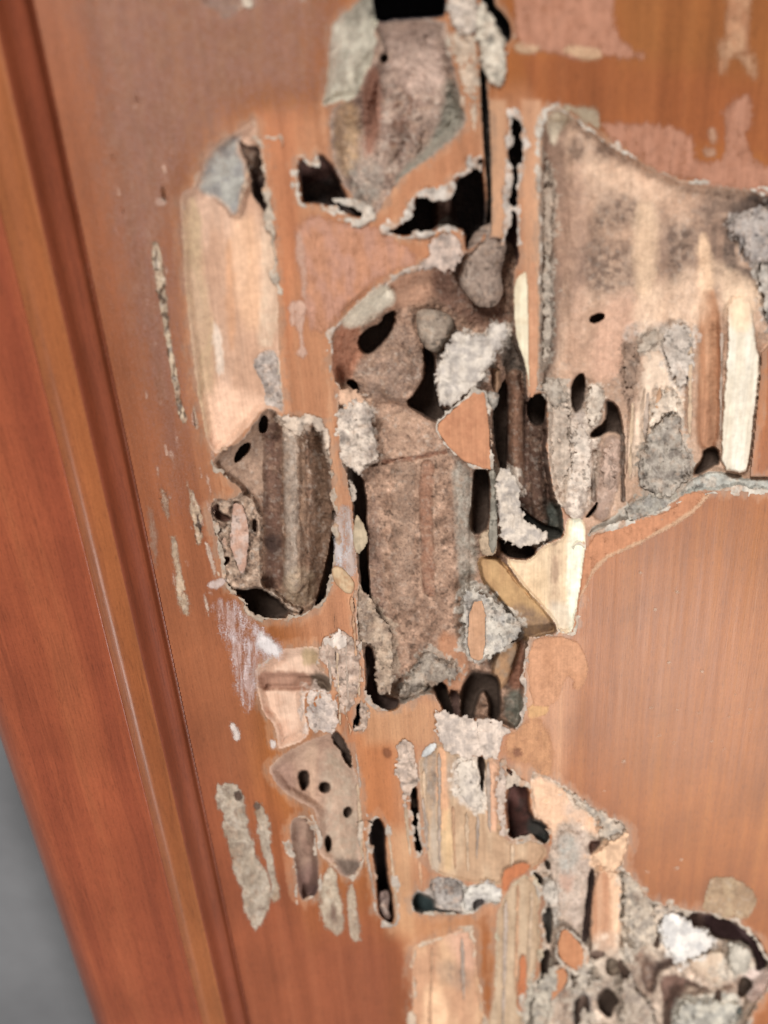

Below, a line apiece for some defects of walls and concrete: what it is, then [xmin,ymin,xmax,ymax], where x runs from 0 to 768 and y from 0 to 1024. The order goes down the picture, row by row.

spalling [190,0,768,905]
spalling [373,759,768,1024]